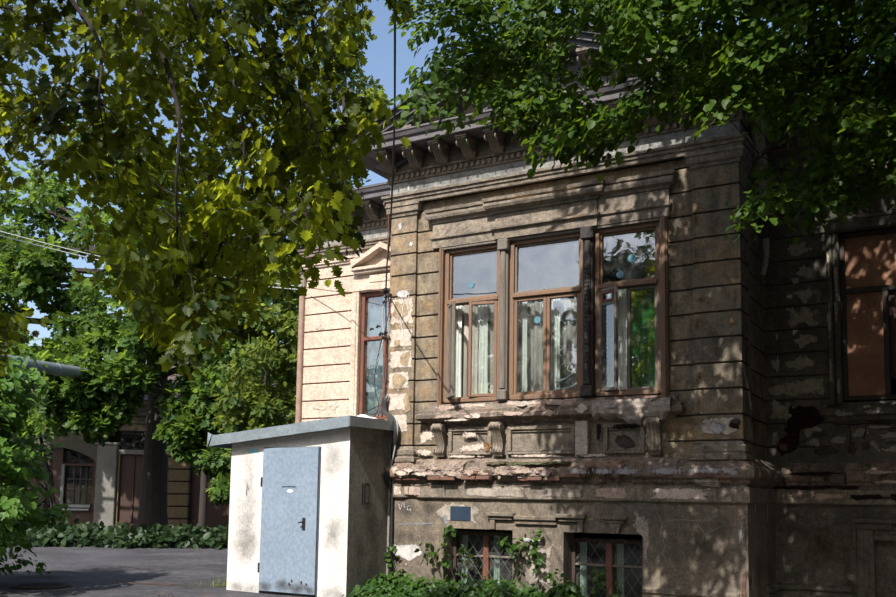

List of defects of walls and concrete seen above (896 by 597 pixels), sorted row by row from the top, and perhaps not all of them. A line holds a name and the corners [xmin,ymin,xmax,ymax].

peeling [387,290,413,432]
peeling [767,240,896,456]
peeling [433,403,485,421]
peeling [501,399,587,416]
spalling [613,424,639,449]
peeling [700,417,740,437]
peeling [391,429,740,524]
spalling [773,467,896,502]
peeling [632,509,650,562]
peeling [393,543,427,566]